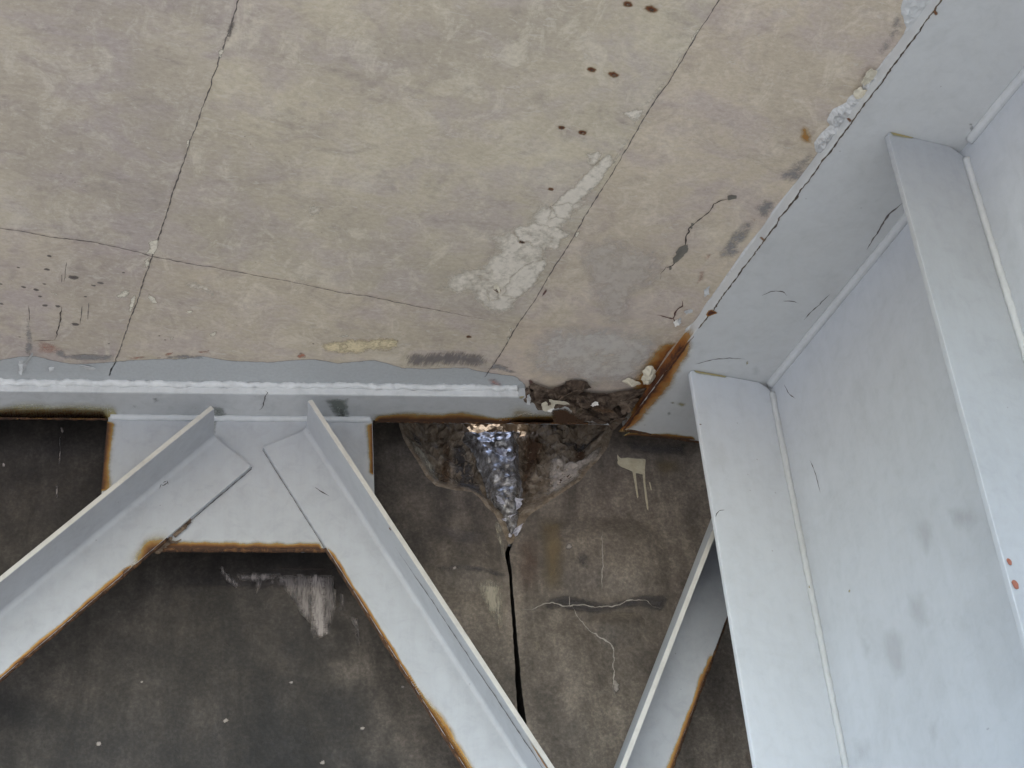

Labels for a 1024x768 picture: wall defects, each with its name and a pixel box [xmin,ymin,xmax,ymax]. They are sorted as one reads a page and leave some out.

corrosion [367,0,942,474]
crack [660,195,737,279]
crack [659,301,683,327]
spalling [399,423,613,544]
corrosion [0,538,472,768]
leakage [221,567,344,638]
crack [507,532,658,724]